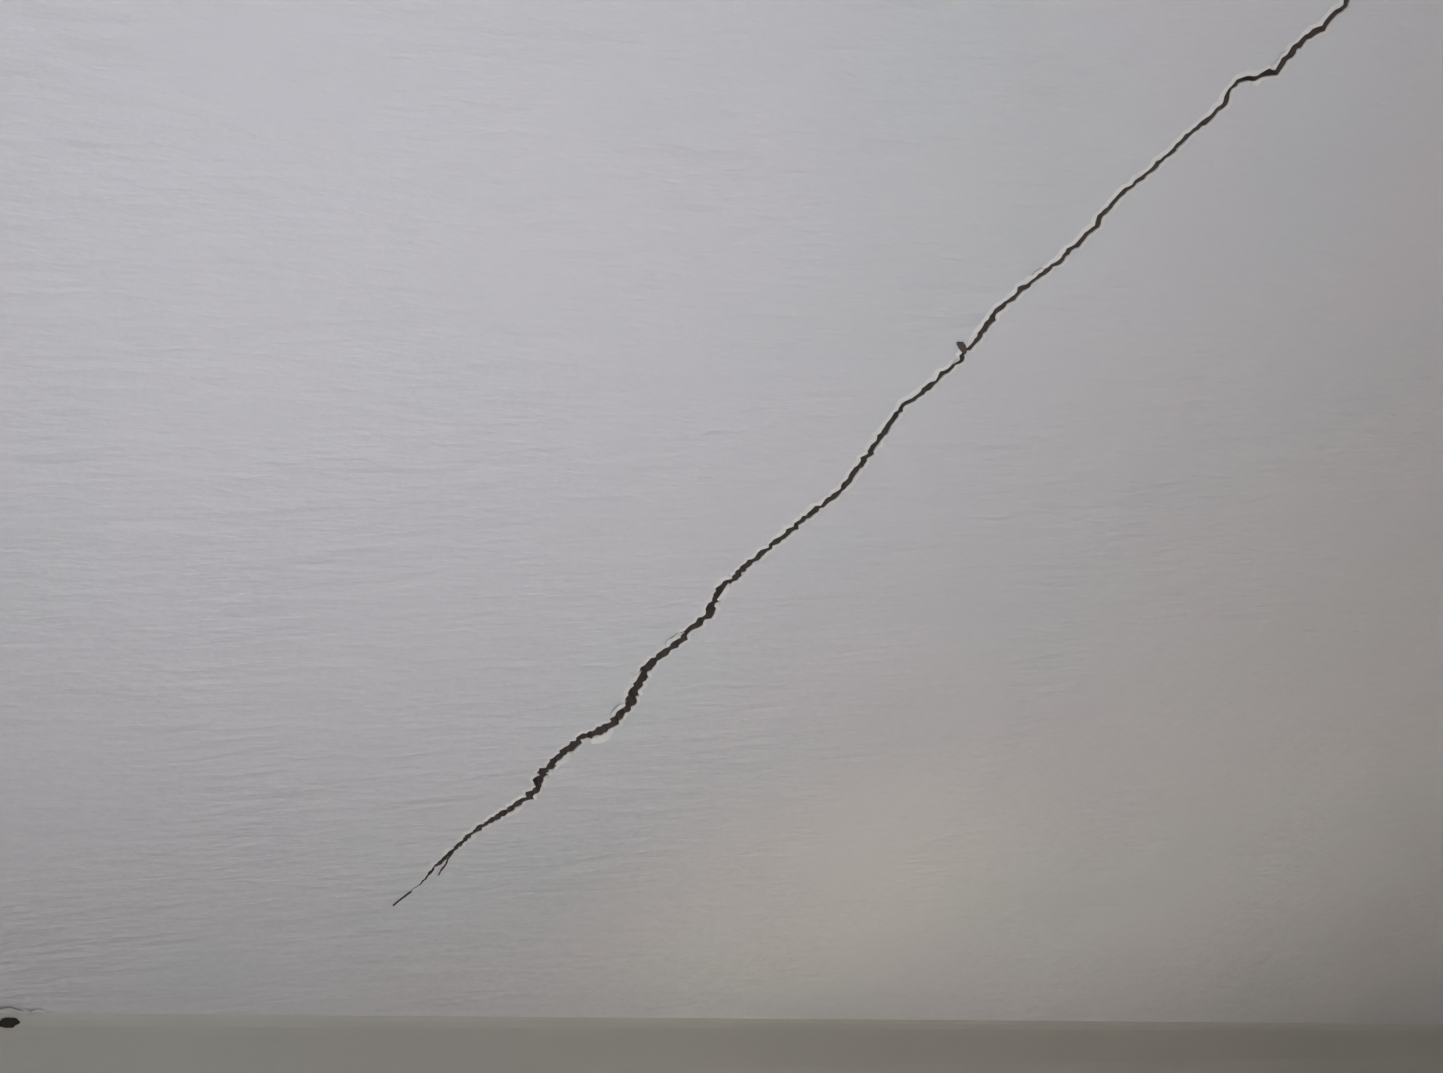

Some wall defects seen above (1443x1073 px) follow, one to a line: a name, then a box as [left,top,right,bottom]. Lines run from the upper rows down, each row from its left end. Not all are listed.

crack [393,0,1352,906]